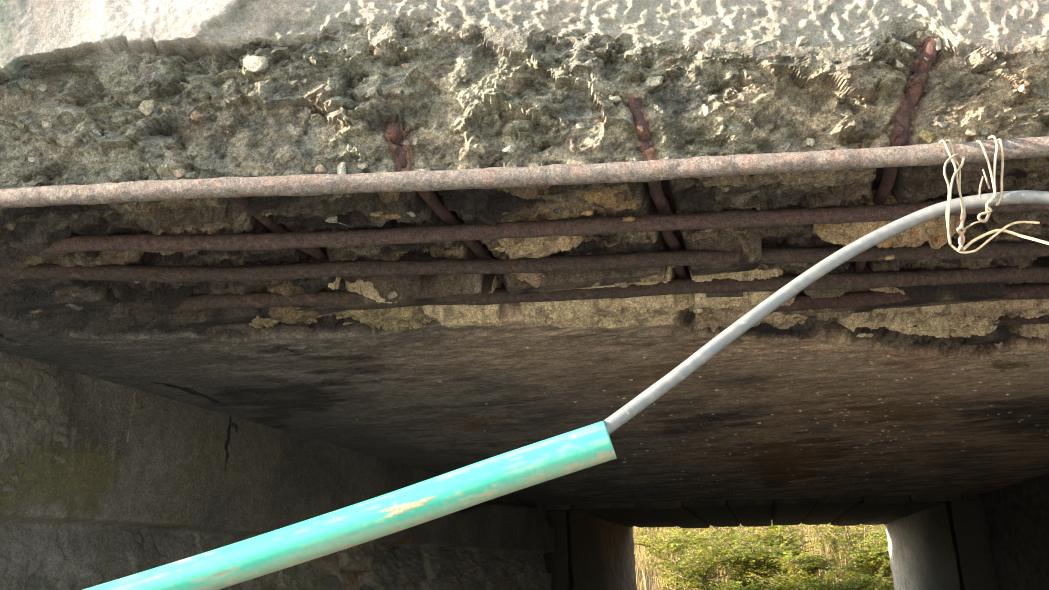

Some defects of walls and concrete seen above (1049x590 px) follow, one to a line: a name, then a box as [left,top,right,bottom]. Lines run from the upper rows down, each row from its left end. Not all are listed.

spalling [0,15,1049,189]
rust [626,93,656,161]
rust [890,40,941,147]
spalling [0,156,1049,372]
crack [155,382,238,470]